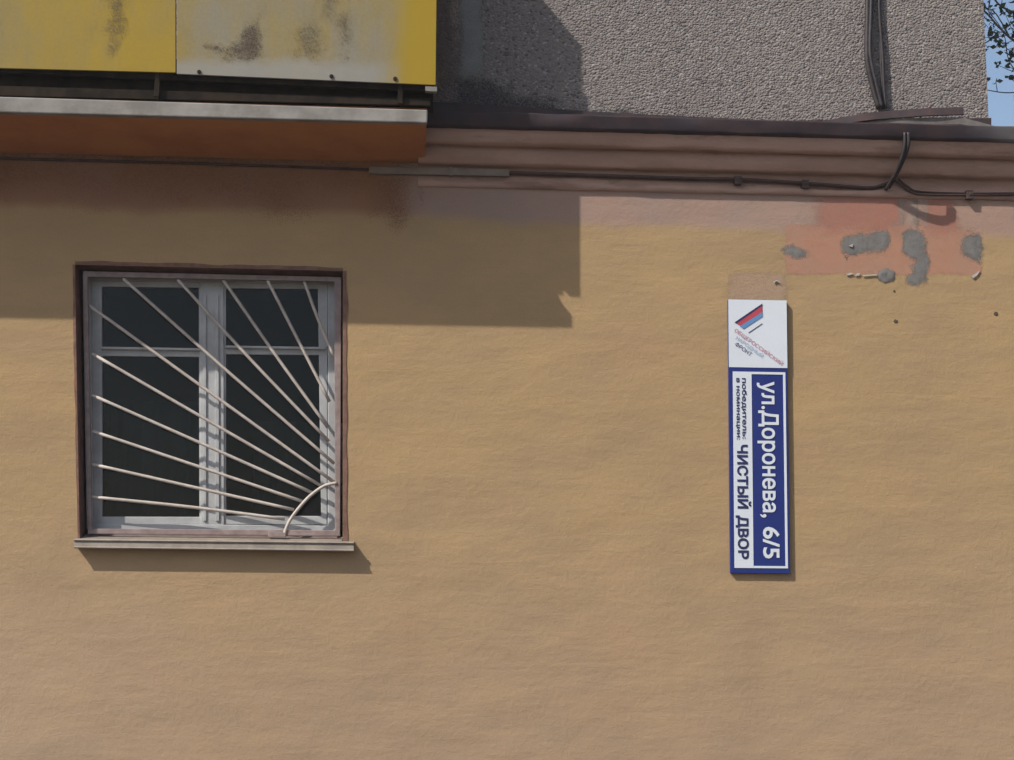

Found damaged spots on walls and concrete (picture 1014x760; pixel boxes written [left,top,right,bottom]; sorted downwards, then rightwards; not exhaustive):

spalling [878,228,931,288]